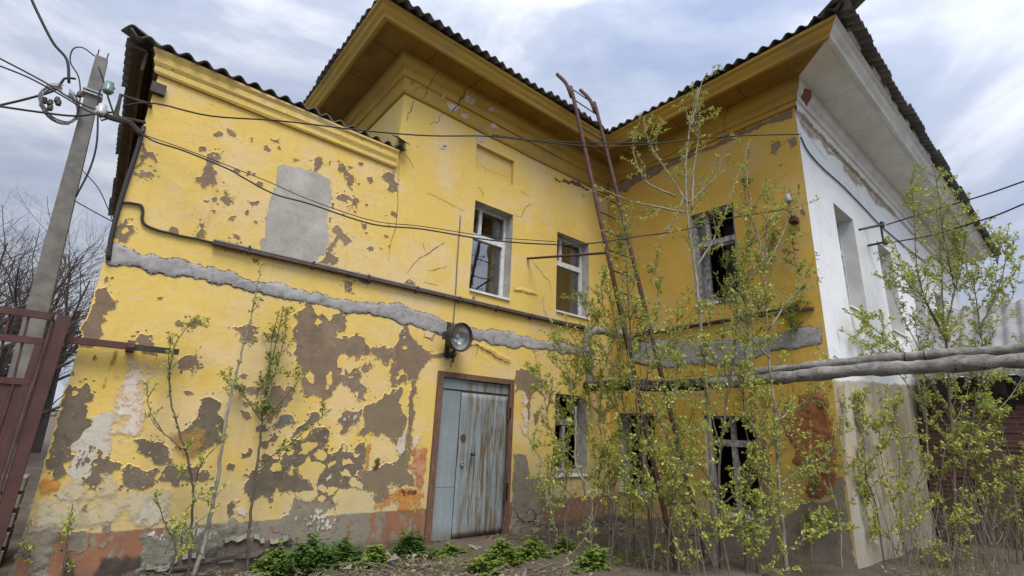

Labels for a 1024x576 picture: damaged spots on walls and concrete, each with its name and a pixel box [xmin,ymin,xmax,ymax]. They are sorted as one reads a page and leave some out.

peeling [114,217,138,243]
peeling [133,142,159,183]
peeling [193,128,264,264]
peeling [293,156,399,294]
crack [388,156,448,284]
spalling [617,88,896,218]
peeling [78,275,119,361]
peeling [8,302,458,576]
spalling [780,392,837,499]